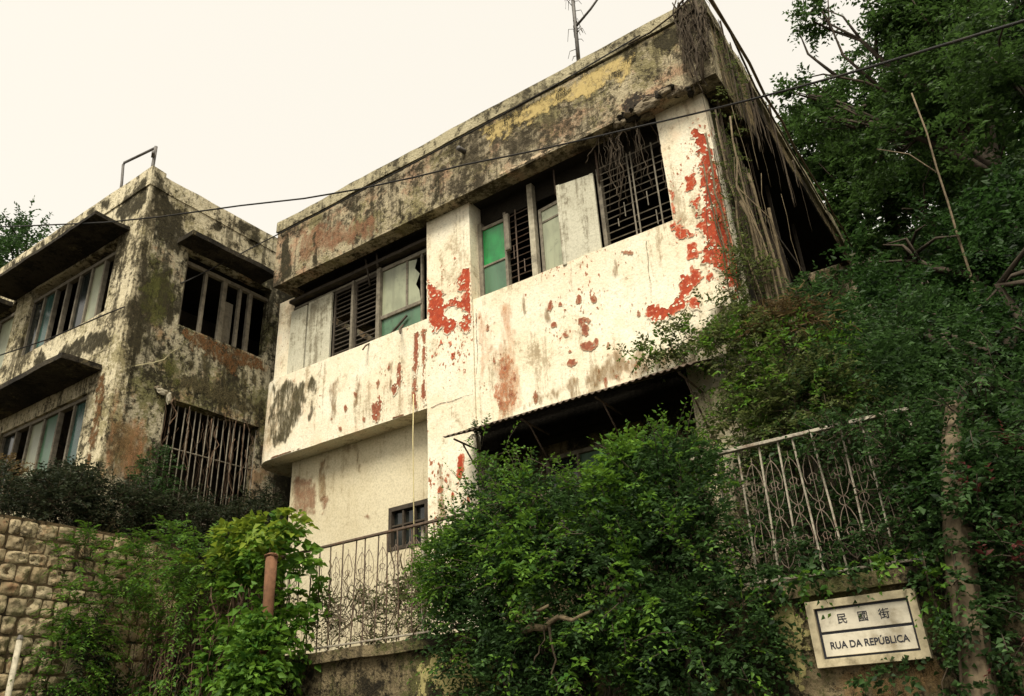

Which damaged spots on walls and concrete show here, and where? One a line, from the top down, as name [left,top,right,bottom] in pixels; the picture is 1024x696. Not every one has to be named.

damp [87,173,186,378]
damp [179,351,316,447]
mould [238,220,260,246]
damp [280,233,292,281]
peeling [362,256,472,423]
peeling [539,118,741,375]